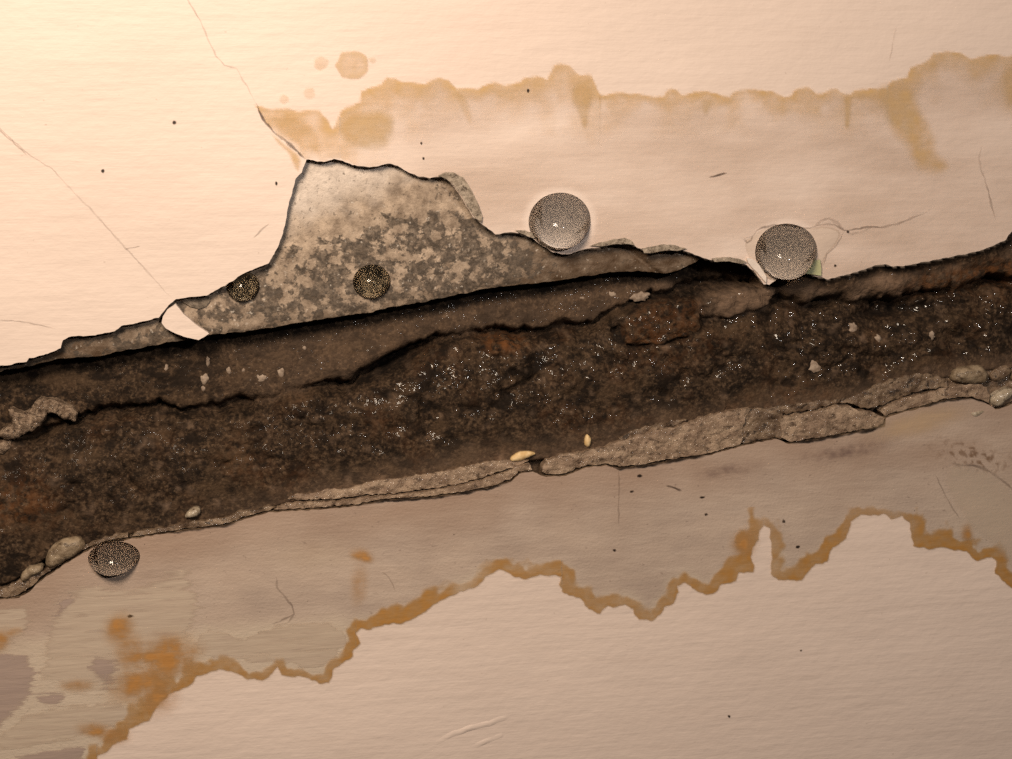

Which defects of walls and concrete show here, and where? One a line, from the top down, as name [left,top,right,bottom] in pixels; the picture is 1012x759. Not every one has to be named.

damp [257,107,309,132]
damp [336,52,367,78]
damp [320,66,736,138]
damp [750,89,827,102]
damp [846,53,998,167]
spalling [0,159,1012,759]
rust [475,509,760,620]
rust [772,512,879,581]
rust [904,514,1012,587]
rust [87,586,454,759]